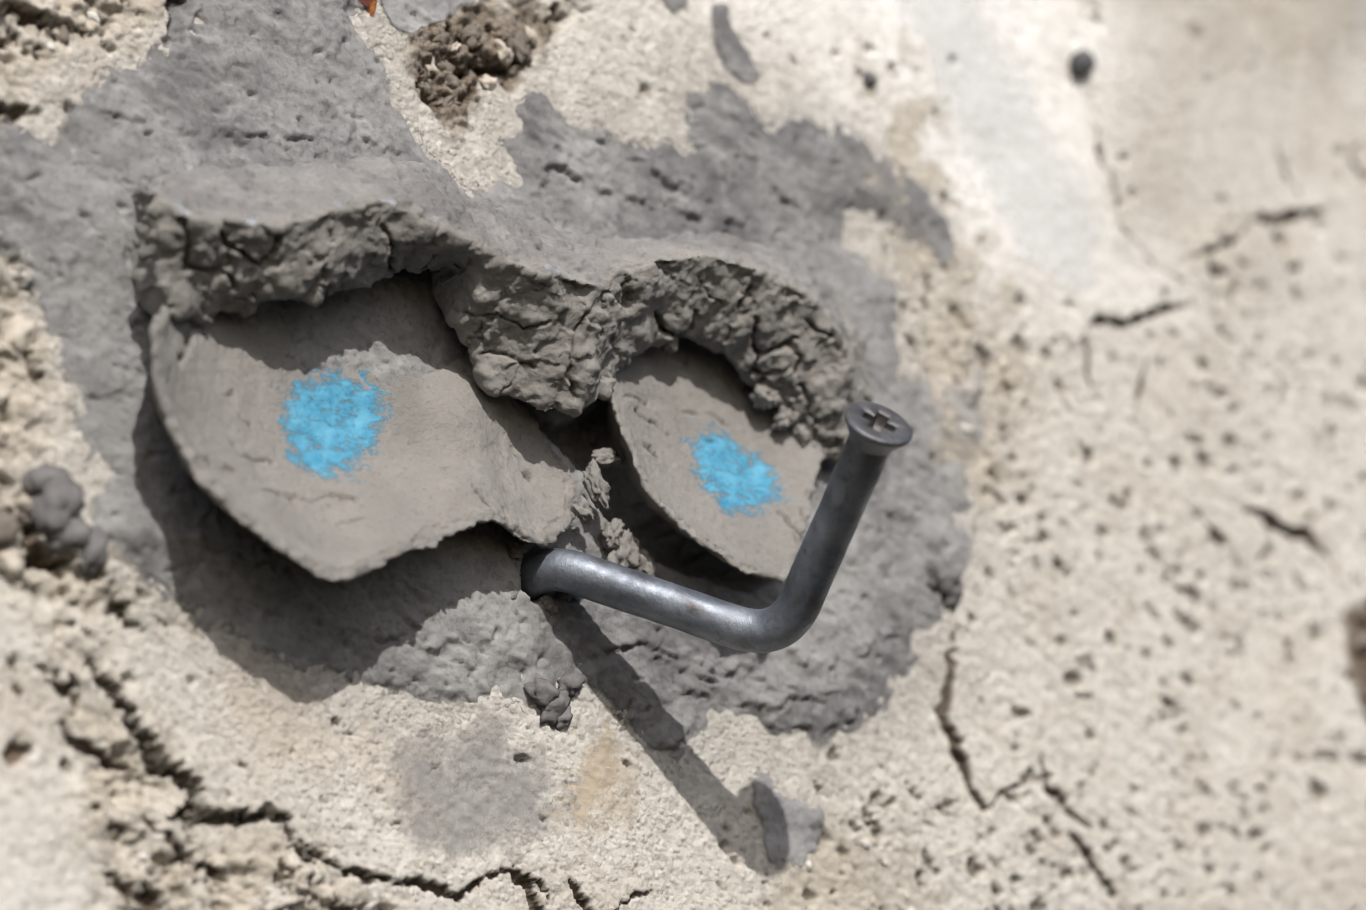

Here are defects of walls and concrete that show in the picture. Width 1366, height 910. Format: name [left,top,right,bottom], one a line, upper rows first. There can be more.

spalling [0,92,26,123]
spalling [0,0,101,71]
spalling [415,0,569,120]
spalling [887,97,957,205]
crack [1082,138,1325,386]
spalling [0,279,43,450]
spalling [901,234,1036,504]
crack [1134,357,1149,410]
spalling [0,462,136,628]
crack [61,659,243,864]
crack [934,625,1122,910]
crack [278,815,652,910]